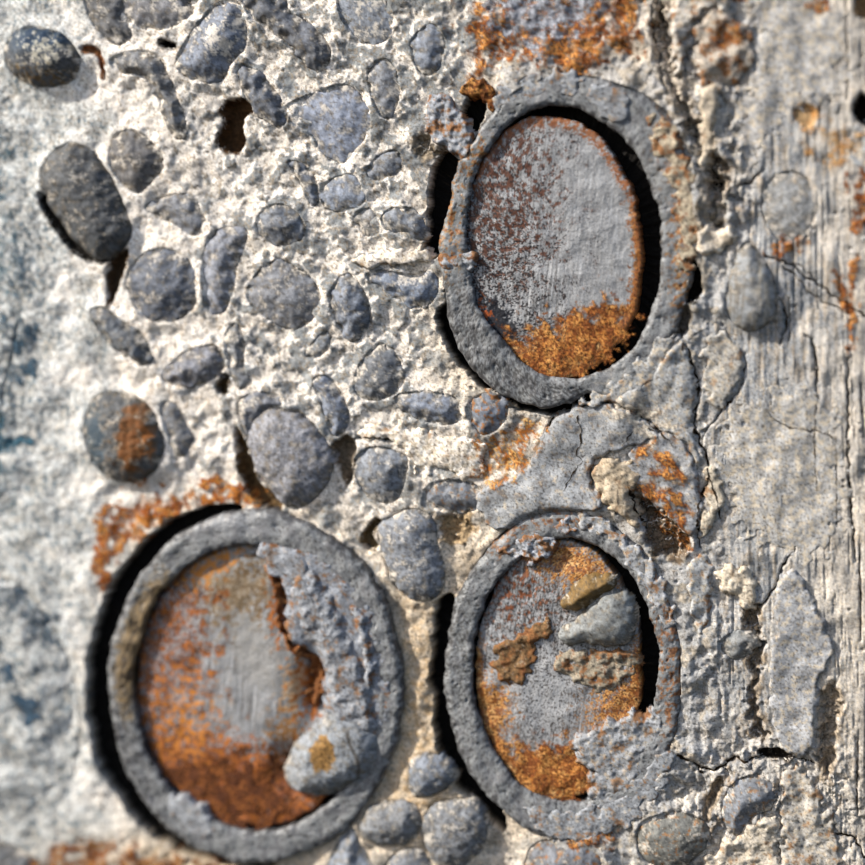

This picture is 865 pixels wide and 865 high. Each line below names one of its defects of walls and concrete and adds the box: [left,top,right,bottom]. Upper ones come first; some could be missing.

corrosion [459,0,653,112]
crack [843,0,851,99]
corrosion [501,292,645,378]
corrosion [831,256,861,354]
corrosion [90,474,273,592]
corrosion [629,436,694,551]
crack [763,256,865,640]
corrosion [268,573,326,707]
corrosion [489,617,553,686]
crack [676,754,761,774]
crack [853,740,861,814]
crack [834,833,865,859]